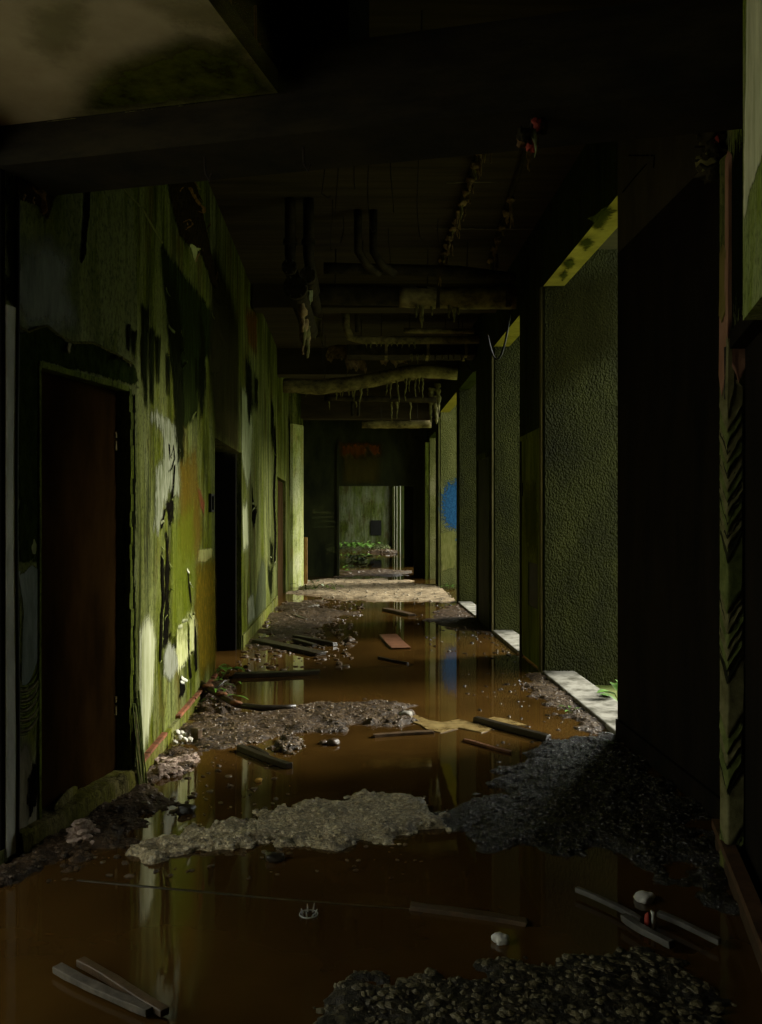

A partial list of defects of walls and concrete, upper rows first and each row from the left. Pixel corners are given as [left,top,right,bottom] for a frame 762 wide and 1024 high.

water stain [3,174,76,327]
water stain [126,254,259,468]
peeling [18,325,138,736]
water stain [139,619,155,749]
peeling [148,408,212,699]
water stain [195,558,216,673]